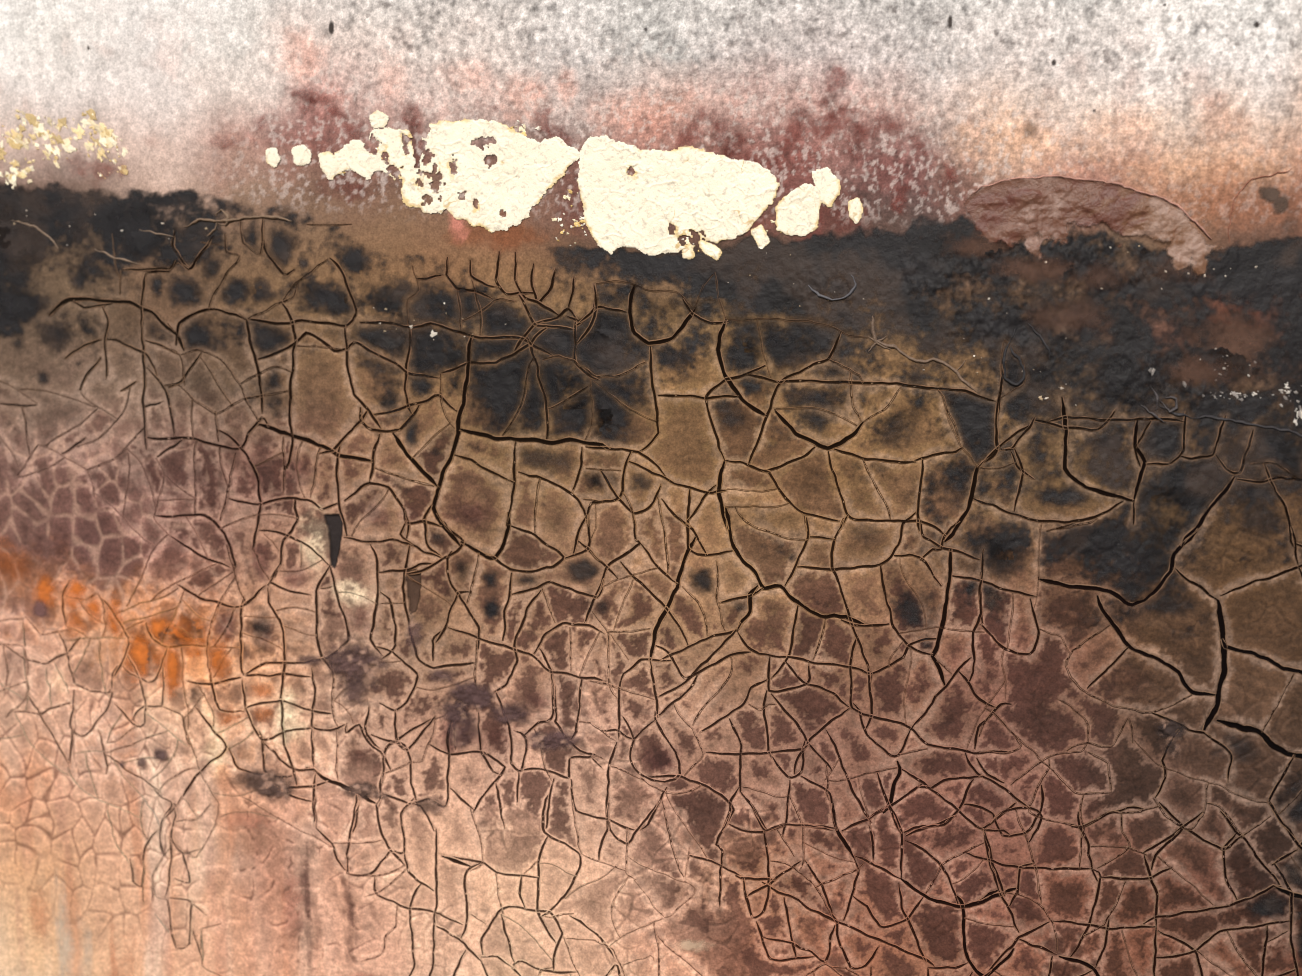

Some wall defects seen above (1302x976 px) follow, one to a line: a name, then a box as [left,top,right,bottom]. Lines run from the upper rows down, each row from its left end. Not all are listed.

peeling [369,110,389,128]
peeling [266,145,339,179]
peeling [682,240,722,261]
peeling [751,225,770,249]
damp [0,182,1302,625]
corrosion [130,620,225,674]
damp [1279,787,1302,821]
damp [1252,894,1302,956]